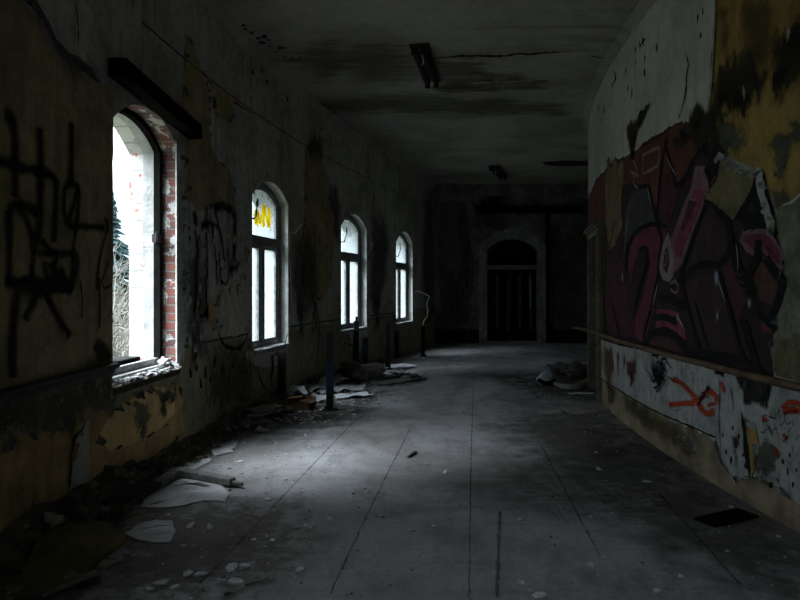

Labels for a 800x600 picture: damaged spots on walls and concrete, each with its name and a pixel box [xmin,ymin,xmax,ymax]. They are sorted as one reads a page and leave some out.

leakage [319,62,565,115]
crack [436,51,569,59]
leakage [673,17,800,161]
leakage [769,121,800,179]
peeling [0,0,250,533]
peeling [601,0,800,504]